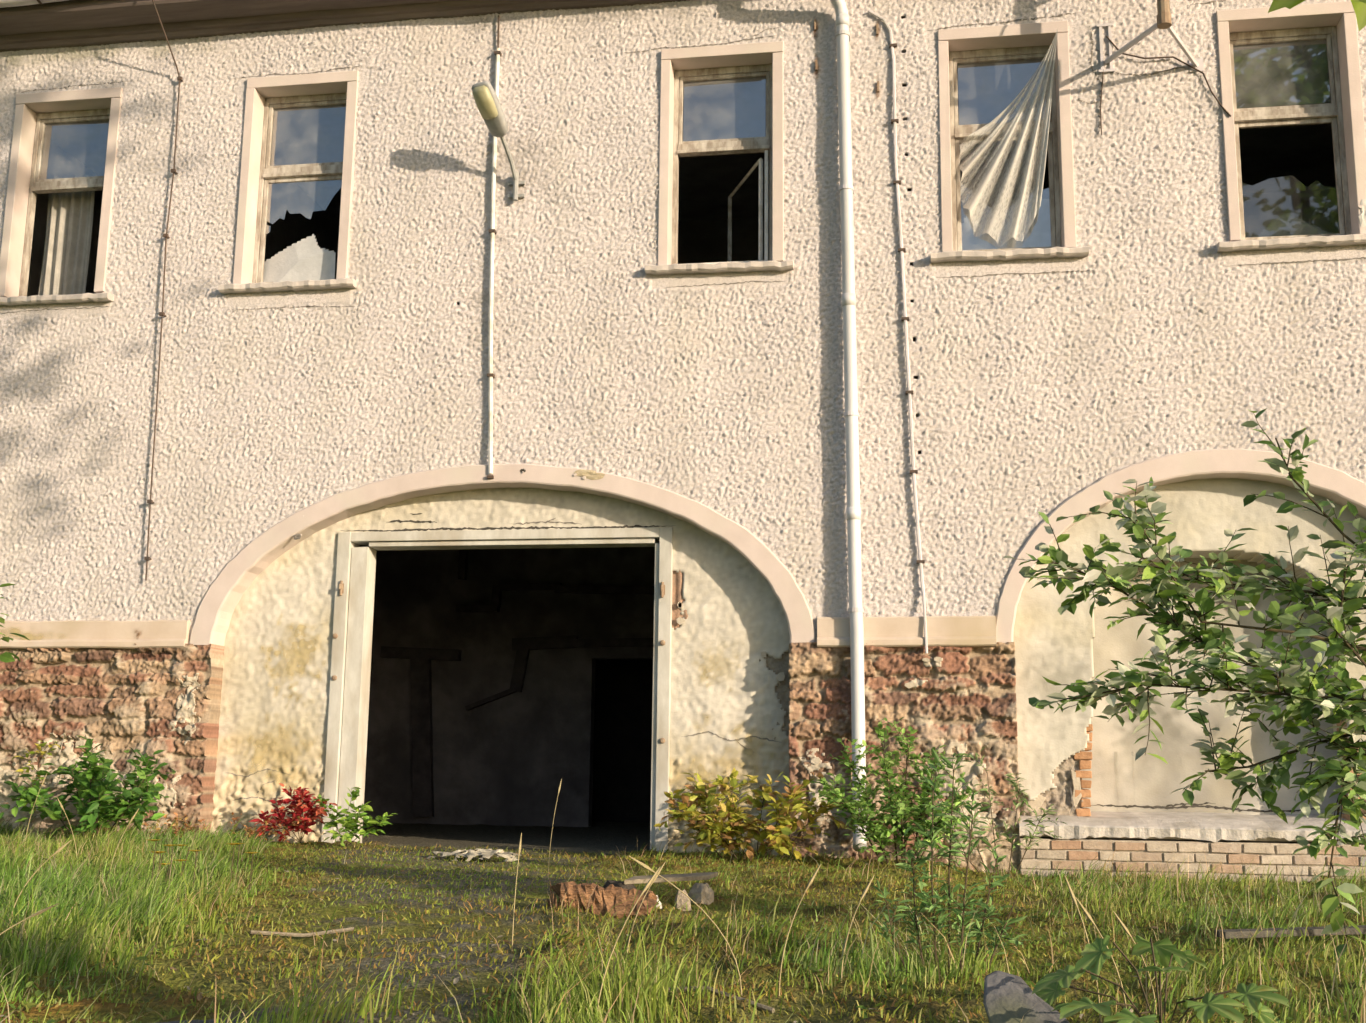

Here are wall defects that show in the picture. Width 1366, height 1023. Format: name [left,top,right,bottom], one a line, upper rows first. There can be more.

crack [927,13,1185,137]
peeling [0,733,187,835]
peeling [169,673,201,745]
crack [681,731,782,753]
spalling [759,651,789,740]
peeling [798,748,840,830]